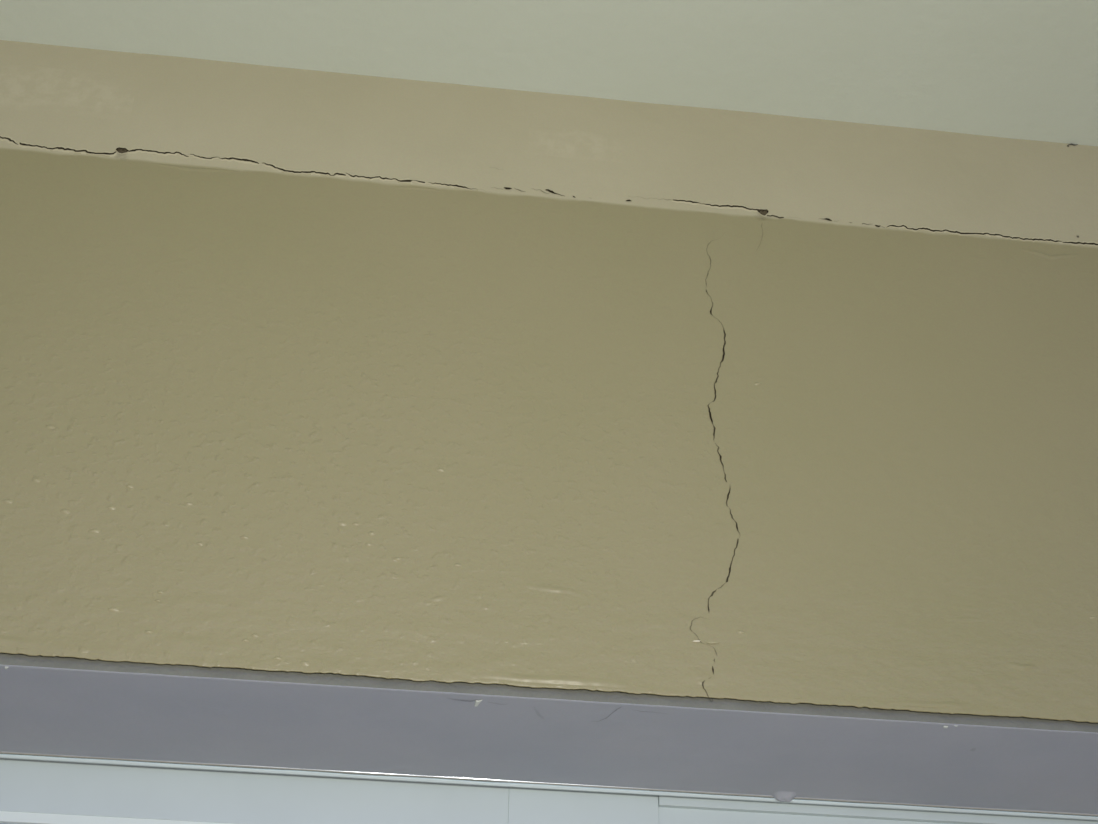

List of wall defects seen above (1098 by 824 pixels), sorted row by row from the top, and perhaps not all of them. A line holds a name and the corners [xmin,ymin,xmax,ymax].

crack [0,135,478,191]
crack [671,199,784,218]
crack [862,223,1098,247]
crack [706,290,738,611]